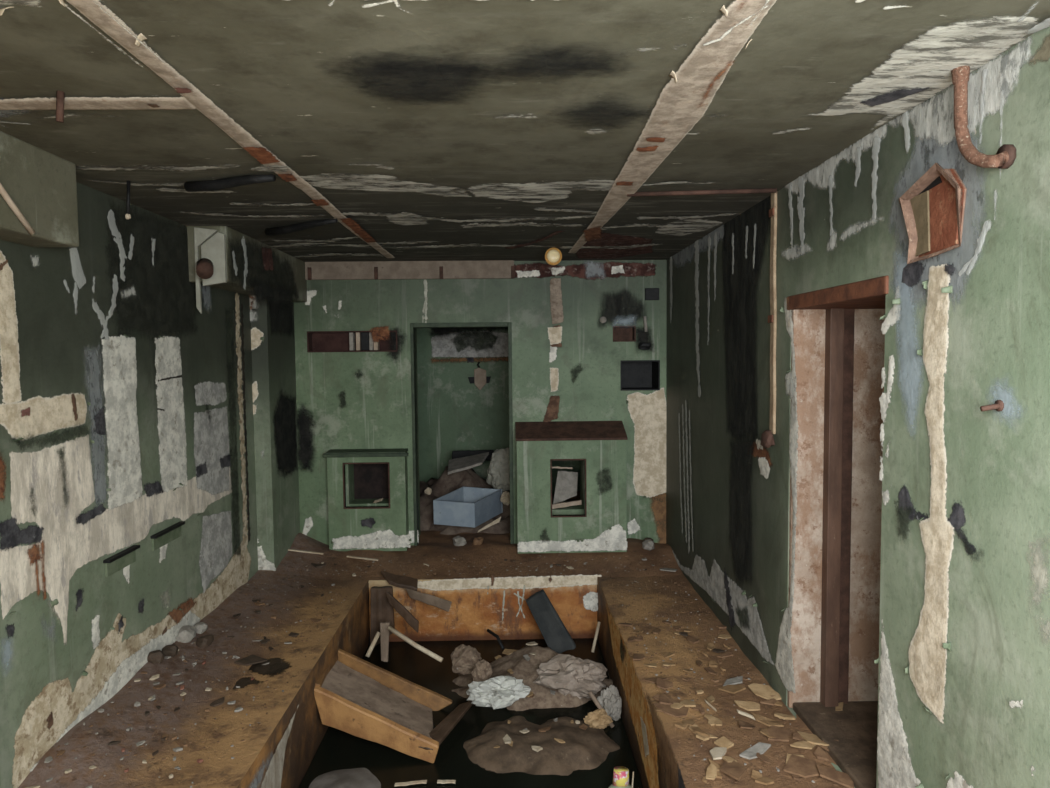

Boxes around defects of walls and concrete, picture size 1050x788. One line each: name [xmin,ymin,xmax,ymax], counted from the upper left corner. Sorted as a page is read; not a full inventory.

crack [363,0,426,11]
water stain [782,2,1050,425]
flaking render [0,250,276,788]
peeling [303,517,313,535]
peeling [331,518,419,549]
peeling [517,519,640,573]
peeling [626,387,666,498]
peeling [672,298,799,693]
peeling [874,261,978,788]
spalling [237,563,686,788]